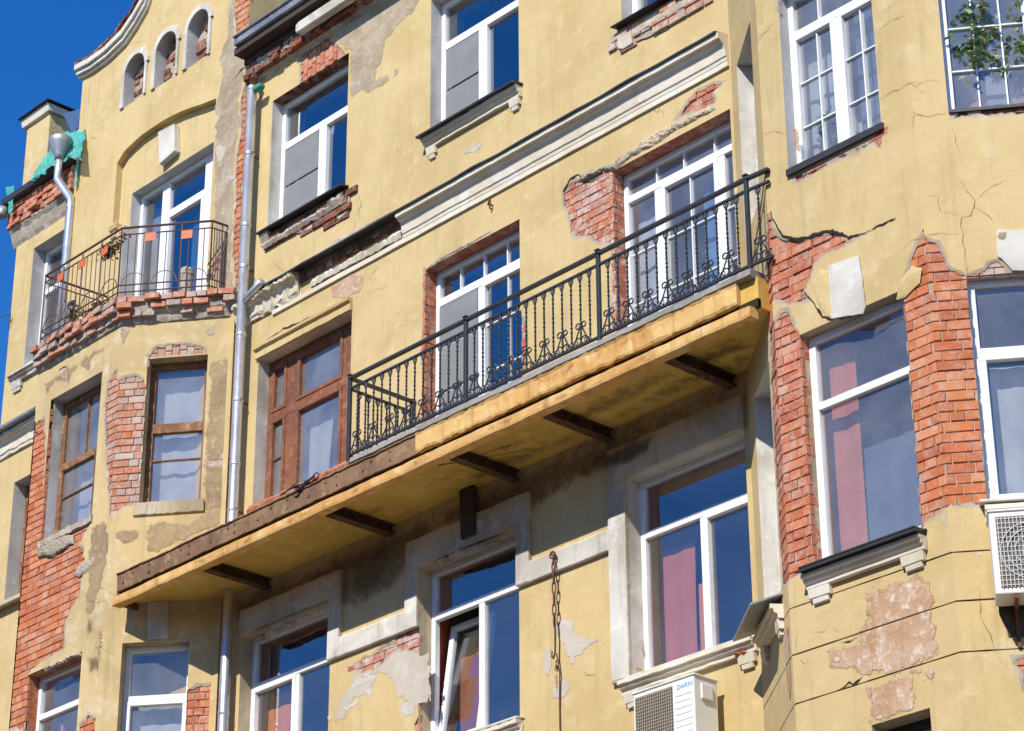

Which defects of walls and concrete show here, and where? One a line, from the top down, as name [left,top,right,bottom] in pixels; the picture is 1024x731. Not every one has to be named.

peeling [299,0,419,97]
flaking render [562,81,725,333]
crack [771,215,895,240]
crack [902,180,1004,277]
crack [804,292,896,320]
flaking render [103,326,215,516]
damp [476,422,647,513]
flaking render [9,409,96,731]
damp [237,526,428,610]
peeling [328,627,432,731]
peeling [544,619,598,698]
peeling [828,573,939,723]